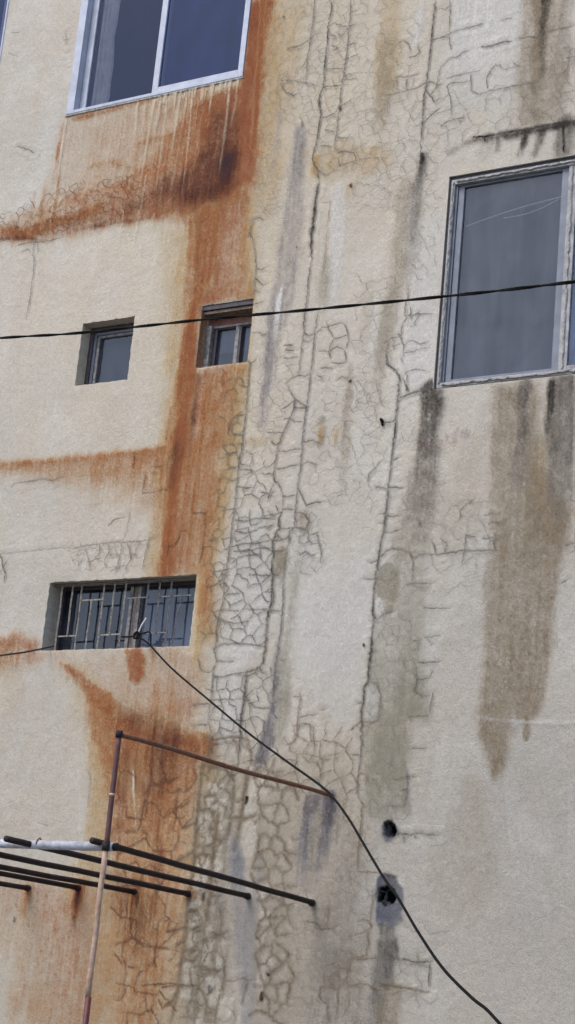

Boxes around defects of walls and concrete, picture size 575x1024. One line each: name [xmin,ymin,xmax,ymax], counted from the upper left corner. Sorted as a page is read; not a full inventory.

crack [384,3,573,153]
damp [473,0,575,153]
rust [0,0,274,649]
crack [88,0,501,1024]
damp [418,381,443,461]
damp [479,375,574,777]
rust [40,648,213,1024]